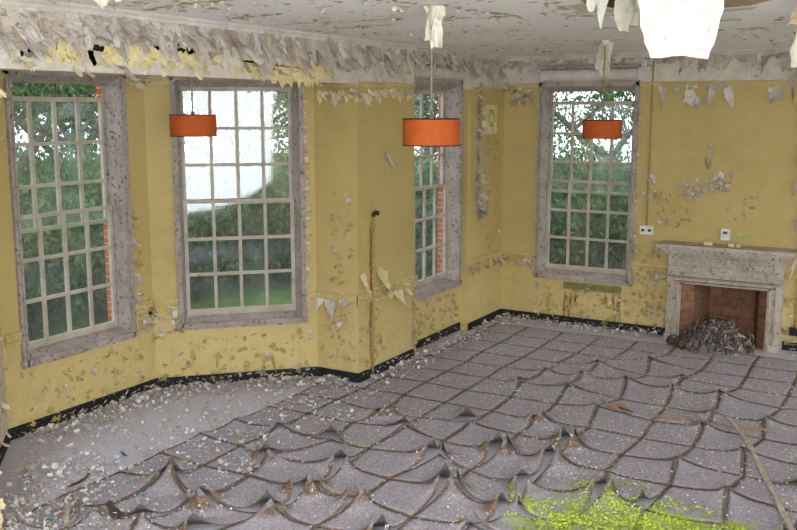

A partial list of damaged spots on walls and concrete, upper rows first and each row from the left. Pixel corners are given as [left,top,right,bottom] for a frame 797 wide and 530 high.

spalling [0,0,797,189]
peeling [0,336,12,447]
peeling [17,98,797,530]